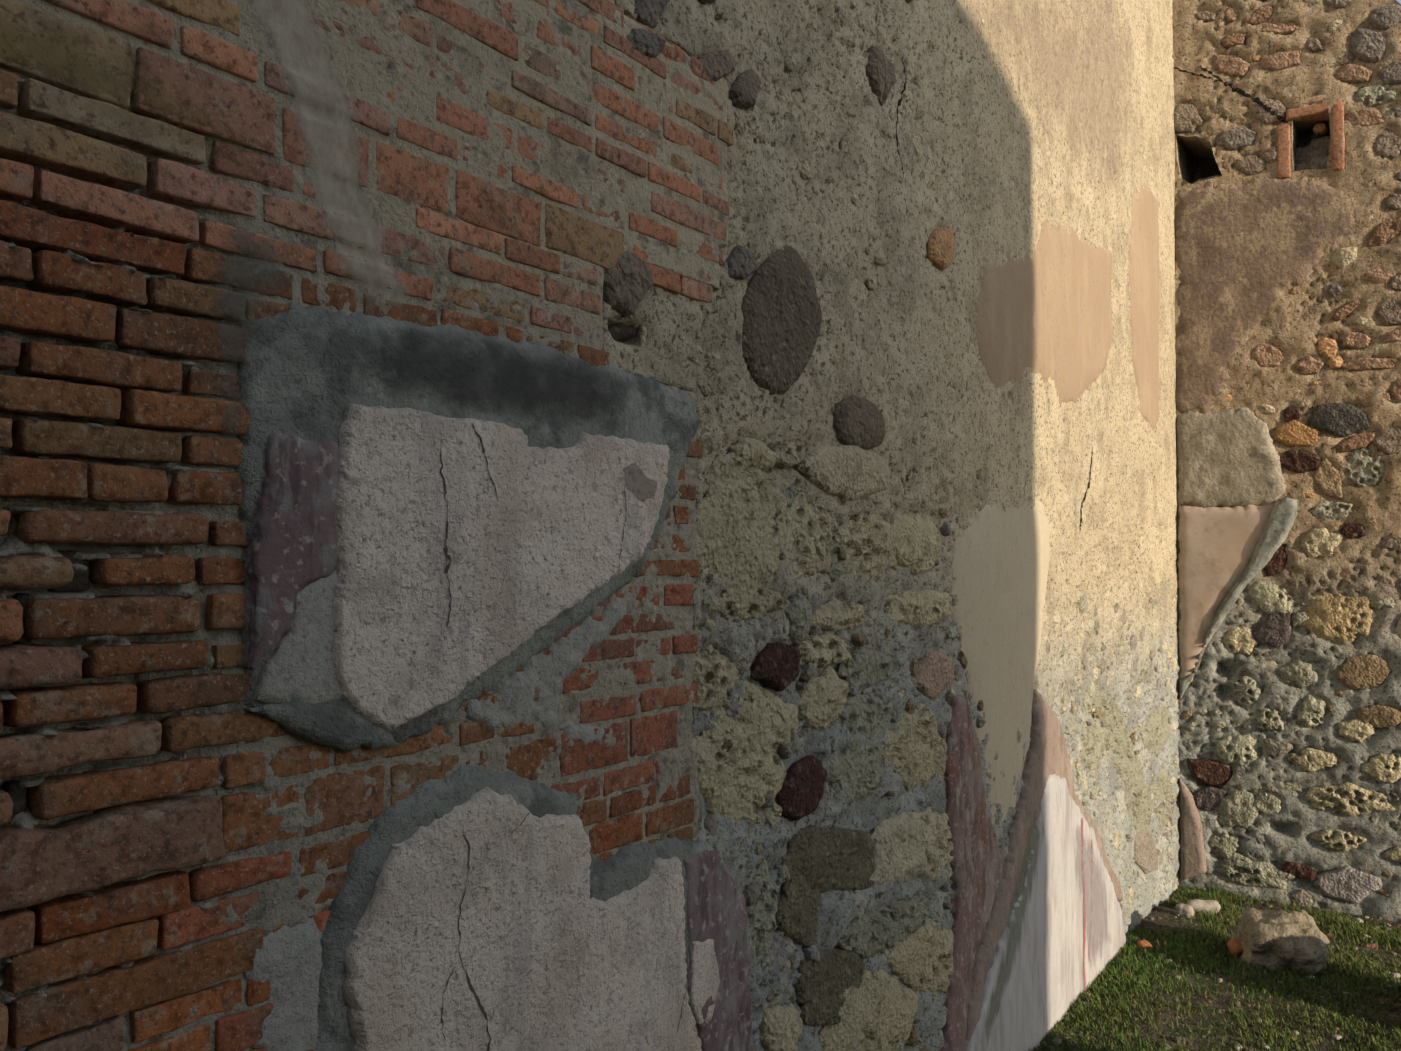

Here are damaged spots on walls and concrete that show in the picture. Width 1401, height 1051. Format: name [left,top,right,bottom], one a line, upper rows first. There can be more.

crack [440,449,451,627]
peeling [236,302,701,752]
crack [468,420,498,502]
crack [441,828,491,1051]